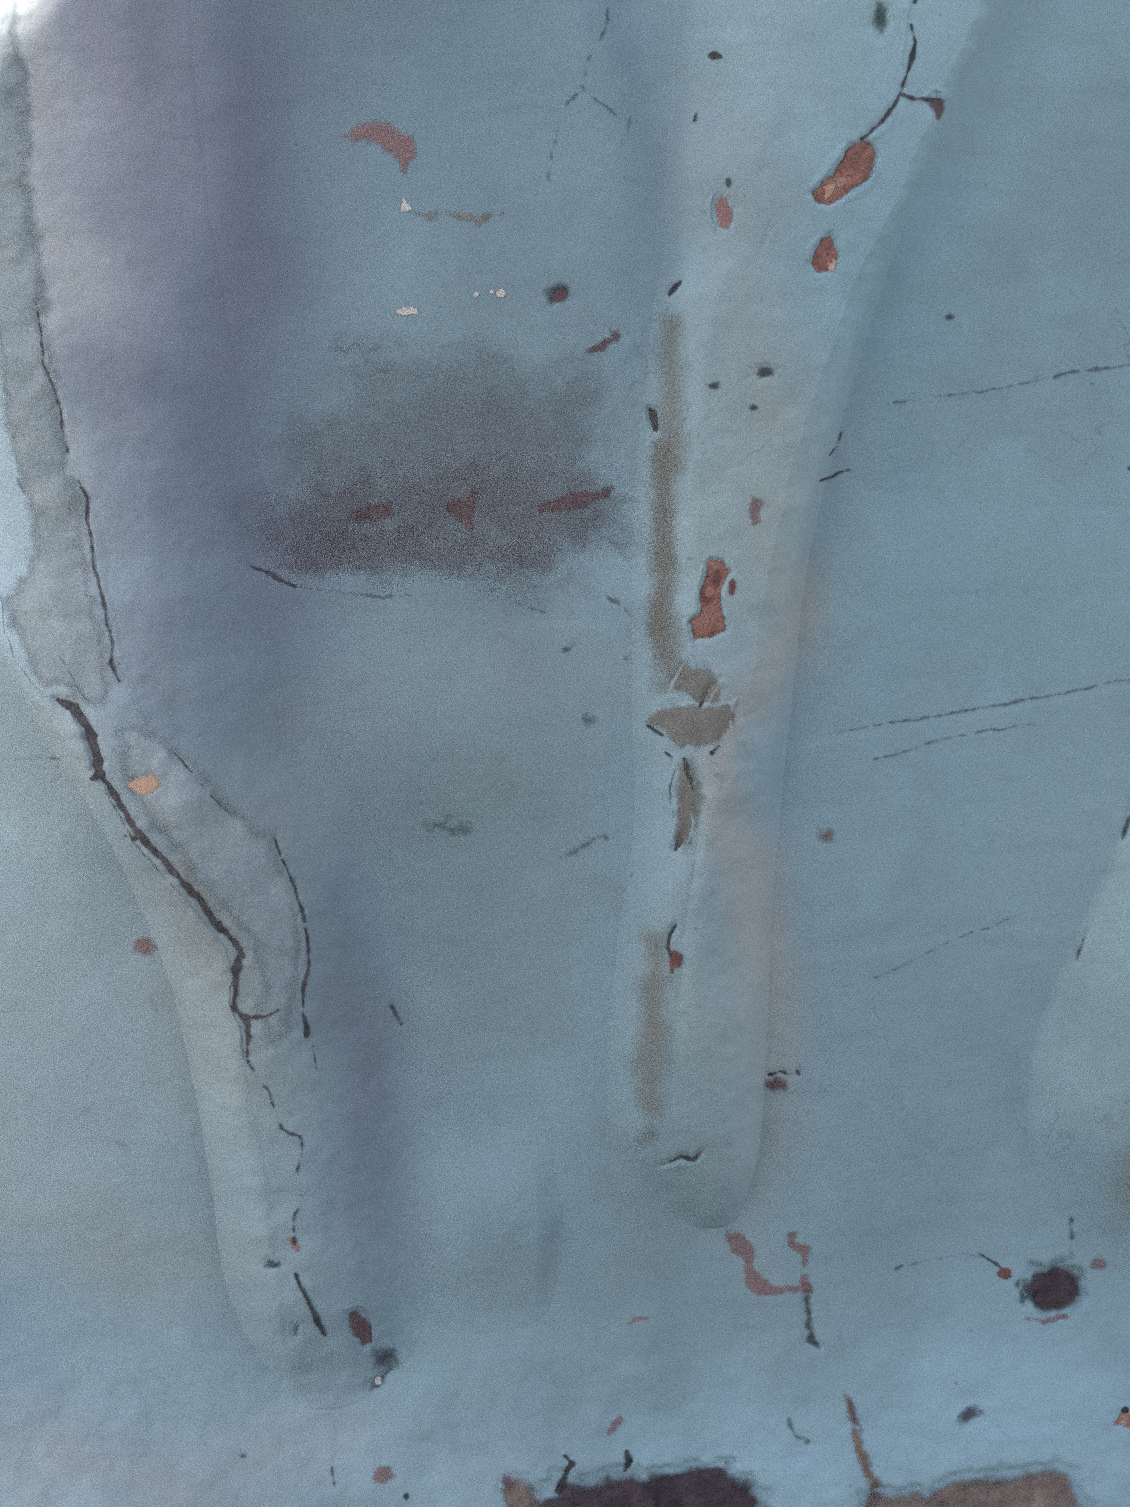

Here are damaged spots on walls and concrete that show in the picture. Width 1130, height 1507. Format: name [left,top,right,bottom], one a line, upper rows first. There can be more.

crack [861,0,941,140]
spalling [351,123,415,171]
spalling [809,141,884,205]
water stain [587,332,620,353]
water stain [539,486,613,512]
spalling [658,560,738,736]
crack [36,303,326,1336]
spalling [501,1449,758,1507]
spalling [867,1469,1077,1507]